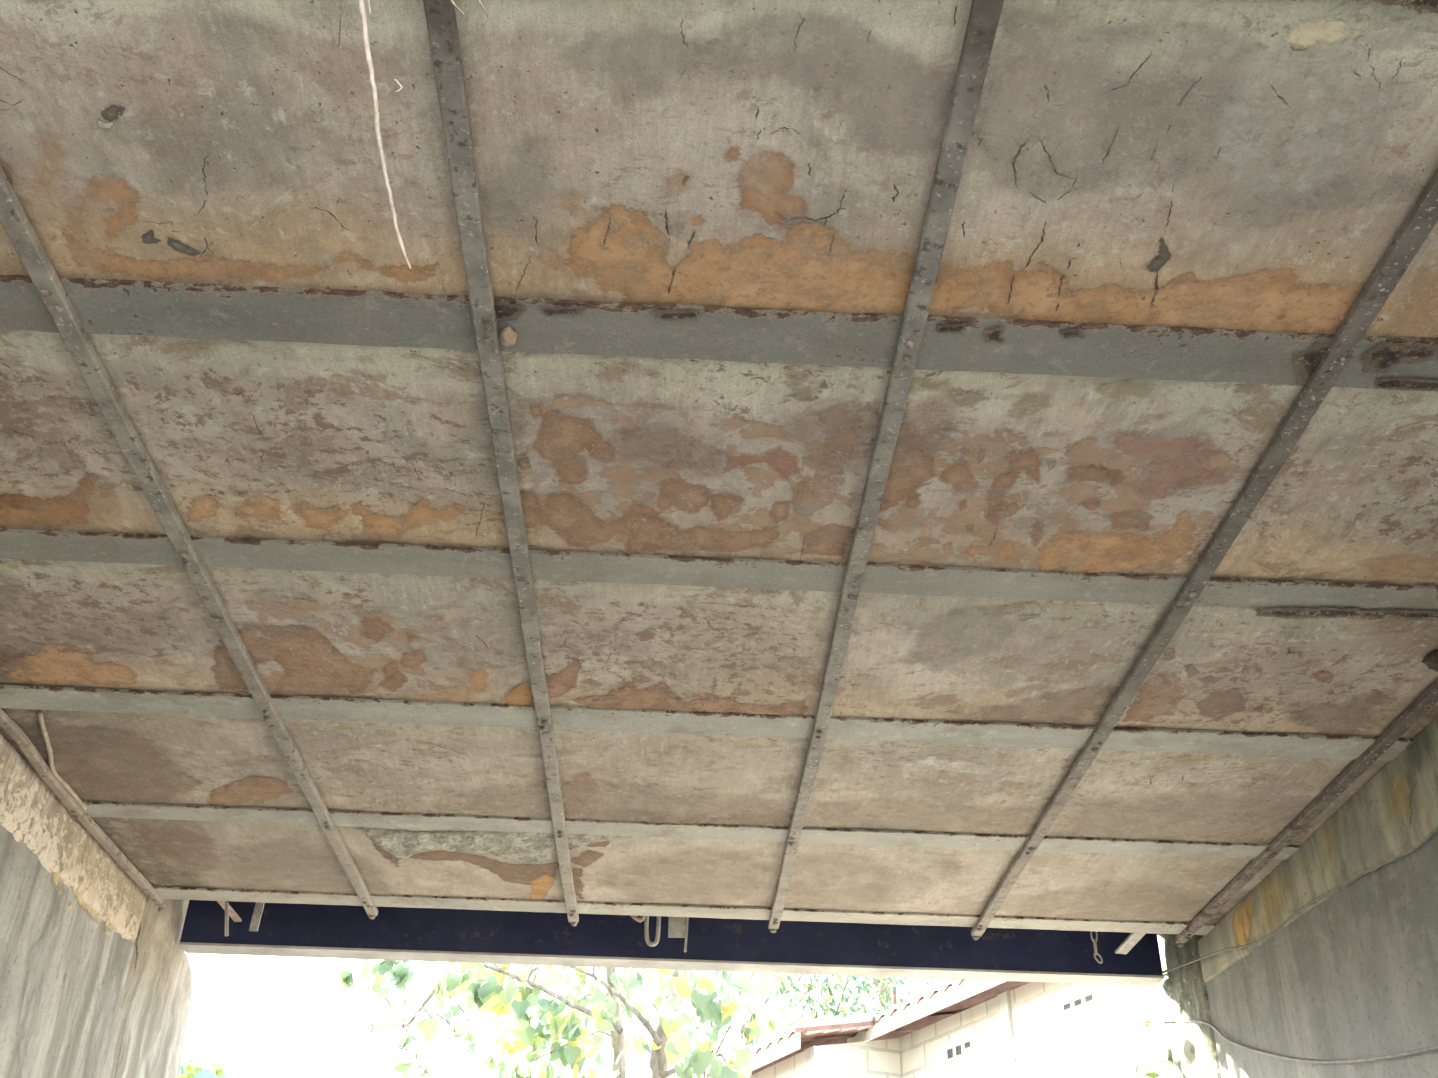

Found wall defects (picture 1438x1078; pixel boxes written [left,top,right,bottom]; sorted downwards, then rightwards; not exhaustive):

rust [1356,0,1438,14]
crack [1098,54,1151,97]
crack [1150,56,1213,225]
crack [1007,85,1121,311]
spalling [142,230,200,256]
spalling [1147,238,1172,272]
crack [1150,273,1158,310]
rust [928,261,1363,385]
rust [1348,341,1438,391]
rust [1254,595,1438,621]
rust [1123,648,1407,732]